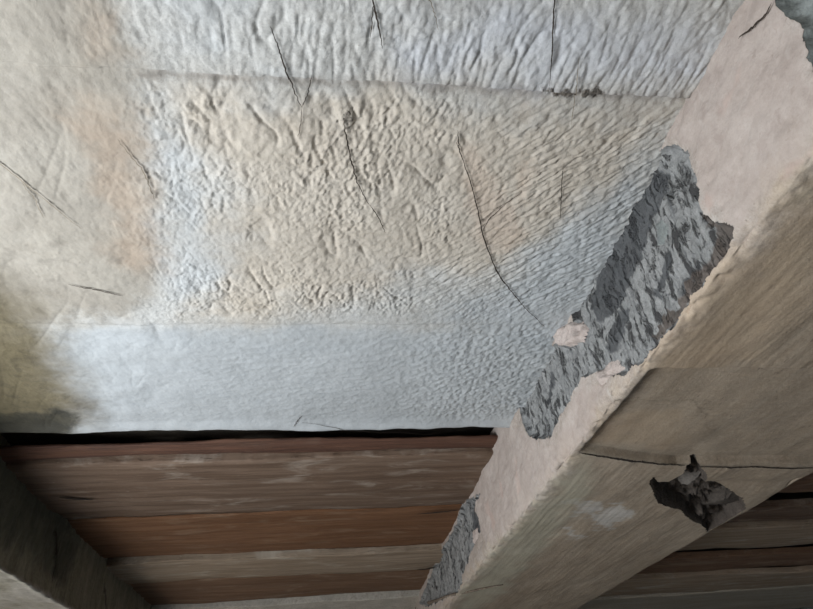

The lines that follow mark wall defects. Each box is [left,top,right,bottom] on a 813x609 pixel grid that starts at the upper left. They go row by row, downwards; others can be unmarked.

crack [271,28,312,135]
flaking render [775,0,813,66]
crack [343,118,386,233]
crack [456,136,544,326]
flaking render [519,144,734,440]
flaking render [419,493,481,607]
crack [580,452,806,469]
spalling [649,454,746,532]